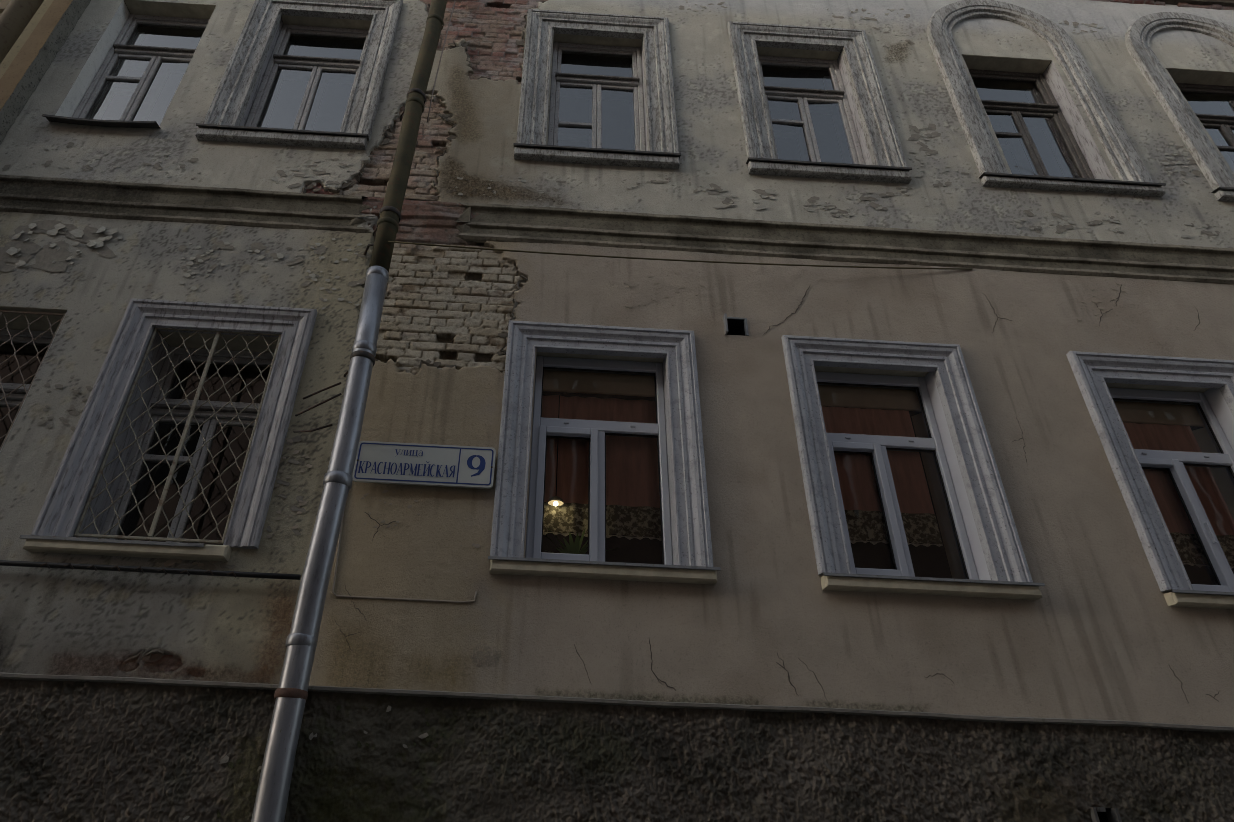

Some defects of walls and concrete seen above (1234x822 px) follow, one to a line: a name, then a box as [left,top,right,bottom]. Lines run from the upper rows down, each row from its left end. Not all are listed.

flaking render [271,106,405,197]
flaking render [404,94,566,201]
peeling [1010,210,1124,234]
flaking render [375,243,525,375]